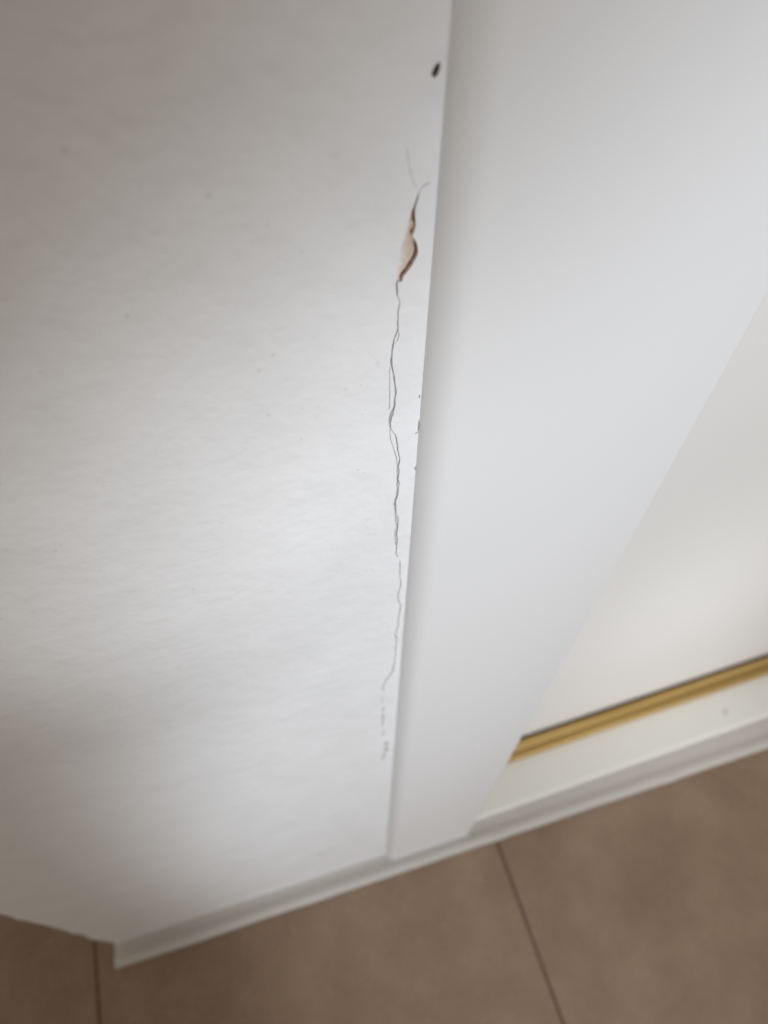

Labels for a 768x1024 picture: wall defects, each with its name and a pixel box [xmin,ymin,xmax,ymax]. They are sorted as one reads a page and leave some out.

flaking render [396,201,417,294]
crack [382,295,401,735]